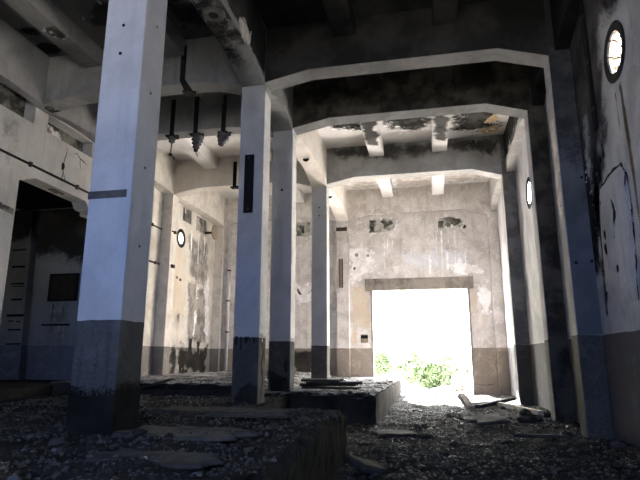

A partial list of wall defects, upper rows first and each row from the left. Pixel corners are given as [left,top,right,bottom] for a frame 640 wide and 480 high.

damp [570,0,619,317]
damp [169,231,210,374]
peeling [290,136,312,341]
peeling [349,217,398,286]
spalling [436,215,493,315]